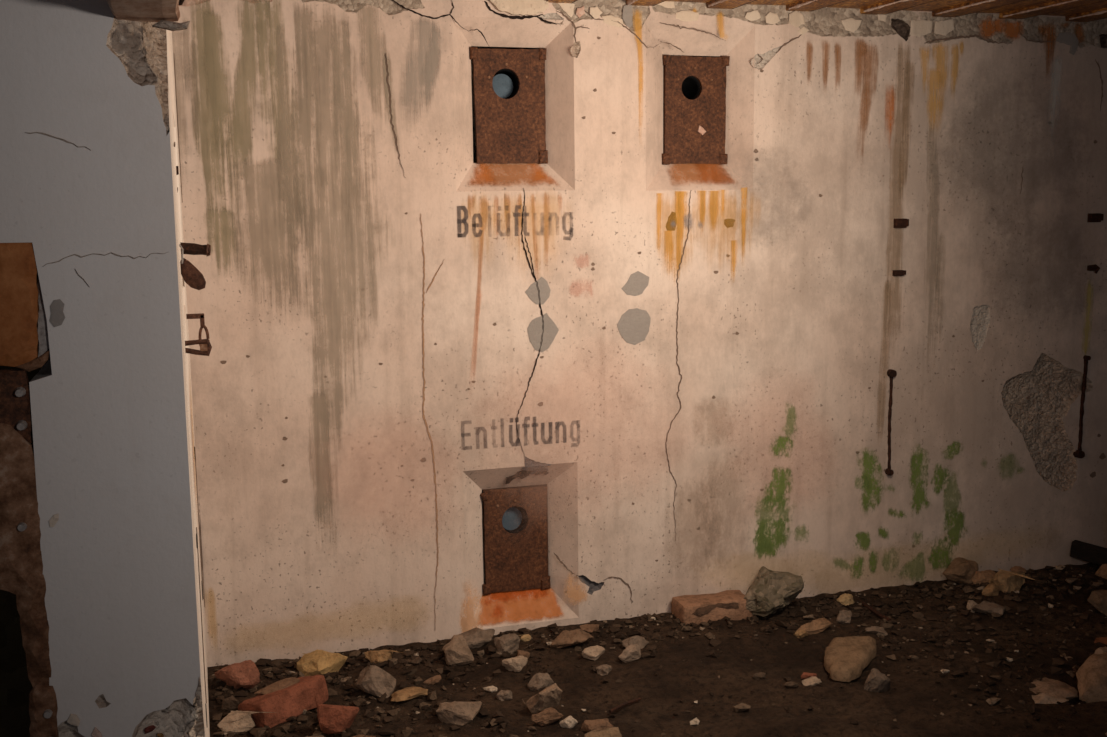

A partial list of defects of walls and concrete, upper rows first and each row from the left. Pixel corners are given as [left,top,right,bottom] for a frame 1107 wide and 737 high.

spalling [106,16,190,136]
leakage [405,19,440,111]
spalling [489,0,1107,49]
rust [856,41,875,129]
leakage [193,0,397,519]
rust [473,163,551,185]
rust [657,163,731,269]
crack [516,188,544,456]
crack [666,192,691,540]
spalling [1001,353,1094,492]
rust [461,578,585,632]
spalling [132,677,205,737]